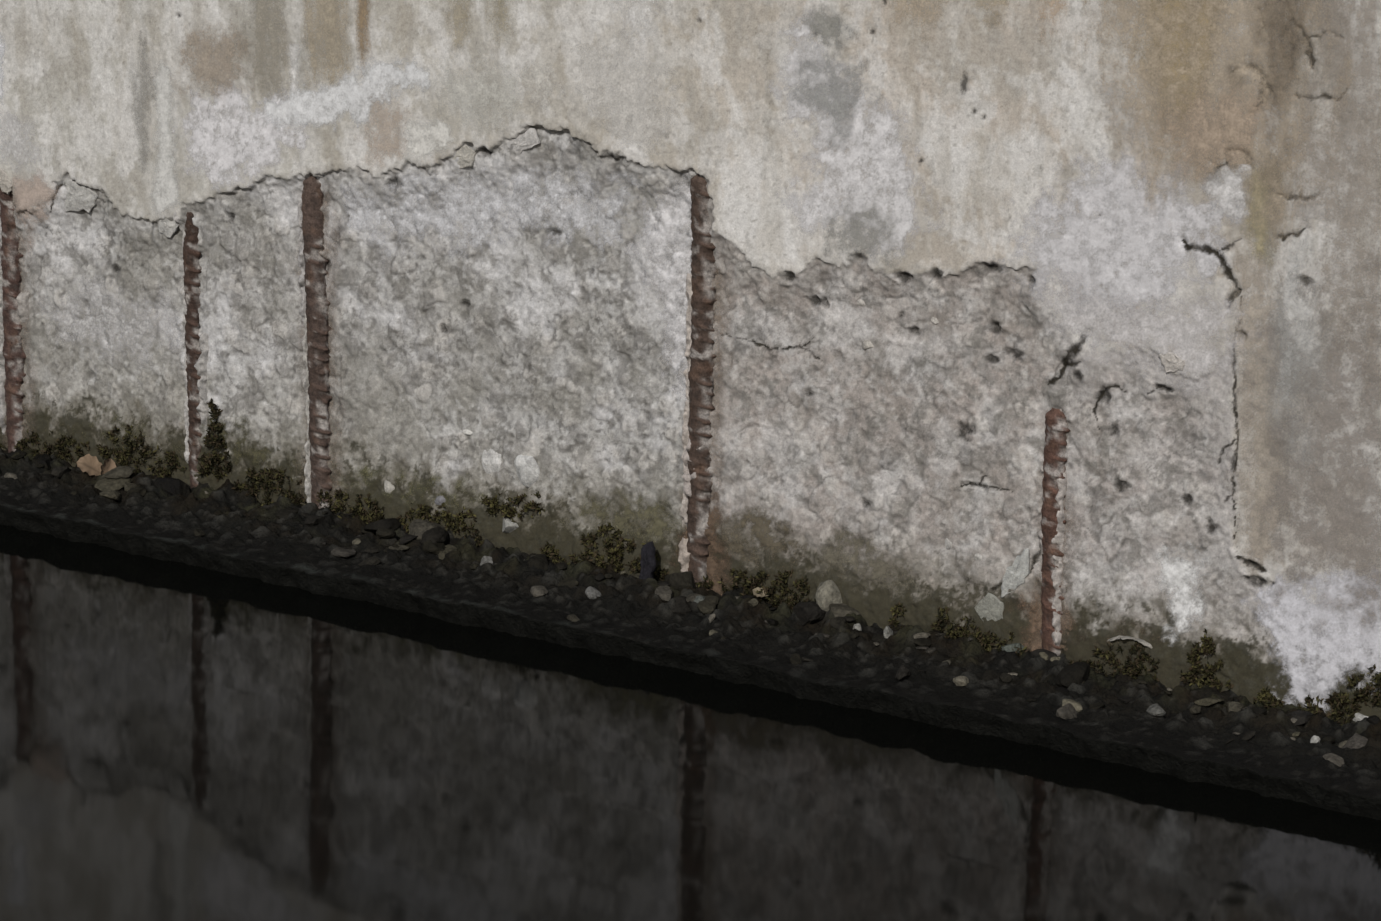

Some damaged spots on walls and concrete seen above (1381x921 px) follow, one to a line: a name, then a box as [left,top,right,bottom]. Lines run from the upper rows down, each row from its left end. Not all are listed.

crack [1233,19,1345,111]
spalling [0,125,1280,703]
damp [1016,155,1251,391]
crack [1182,239,1266,572]
damp [1255,0,1381,709]
rust [677,491,733,596]
rust [1020,591,1042,652]
efflorescence [1158,546,1203,642]